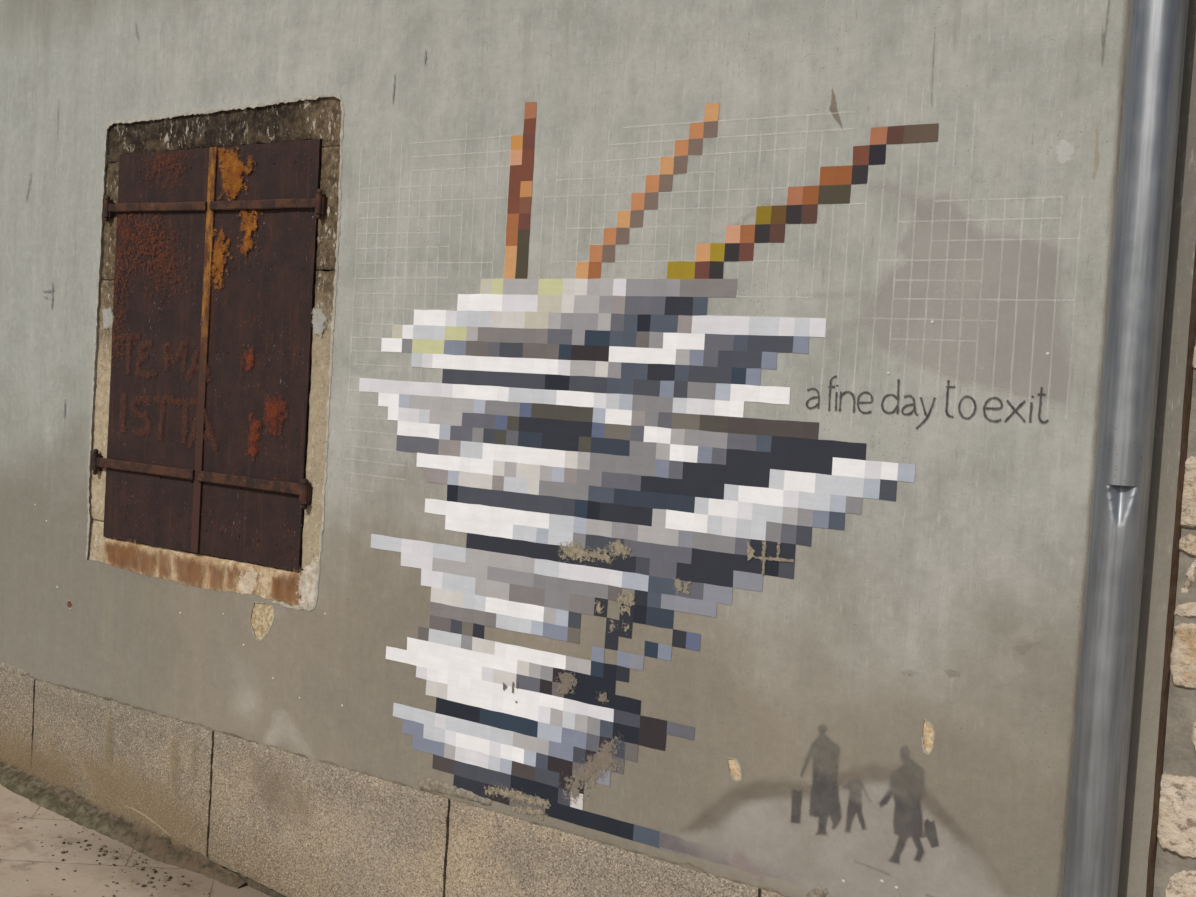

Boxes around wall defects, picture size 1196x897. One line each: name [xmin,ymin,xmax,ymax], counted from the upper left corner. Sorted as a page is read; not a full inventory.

corrosion [210,147,258,289]
corrosion [248,397,285,457]
corrosion [103,541,244,590]
peeling [558,539,632,565]
peeling [747,541,795,575]
corrosion [270,573,303,604]
spalling [251,602,274,641]
peeling [595,590,636,635]
peeling [555,672,577,694]
spalling [921,719,935,755]
peeling [416,733,623,820]
spalling [728,757,743,782]